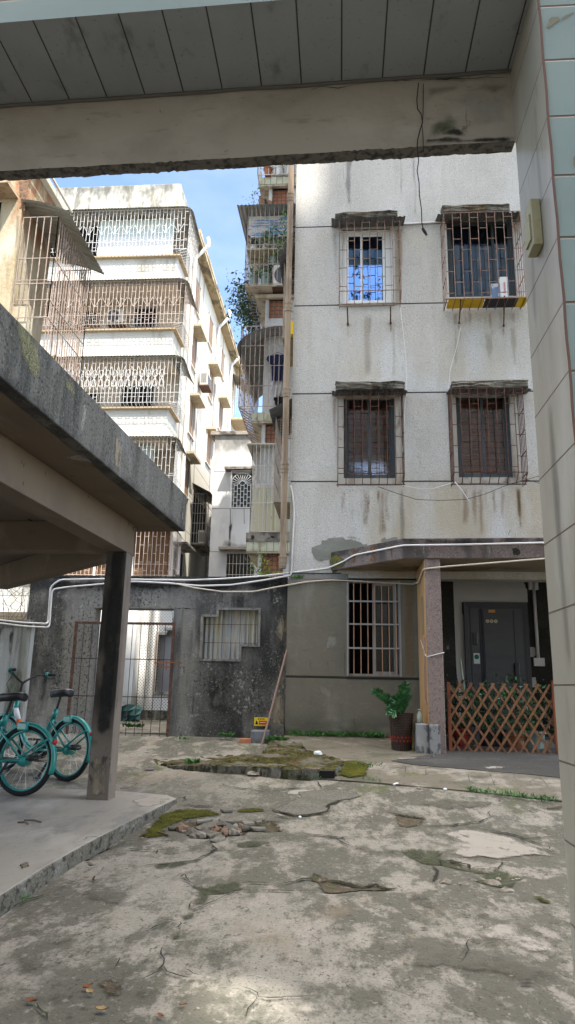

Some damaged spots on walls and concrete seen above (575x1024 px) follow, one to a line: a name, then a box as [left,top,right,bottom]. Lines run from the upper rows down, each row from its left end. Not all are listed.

water stain [427,129,508,142]
spalling [185,821,282,839]